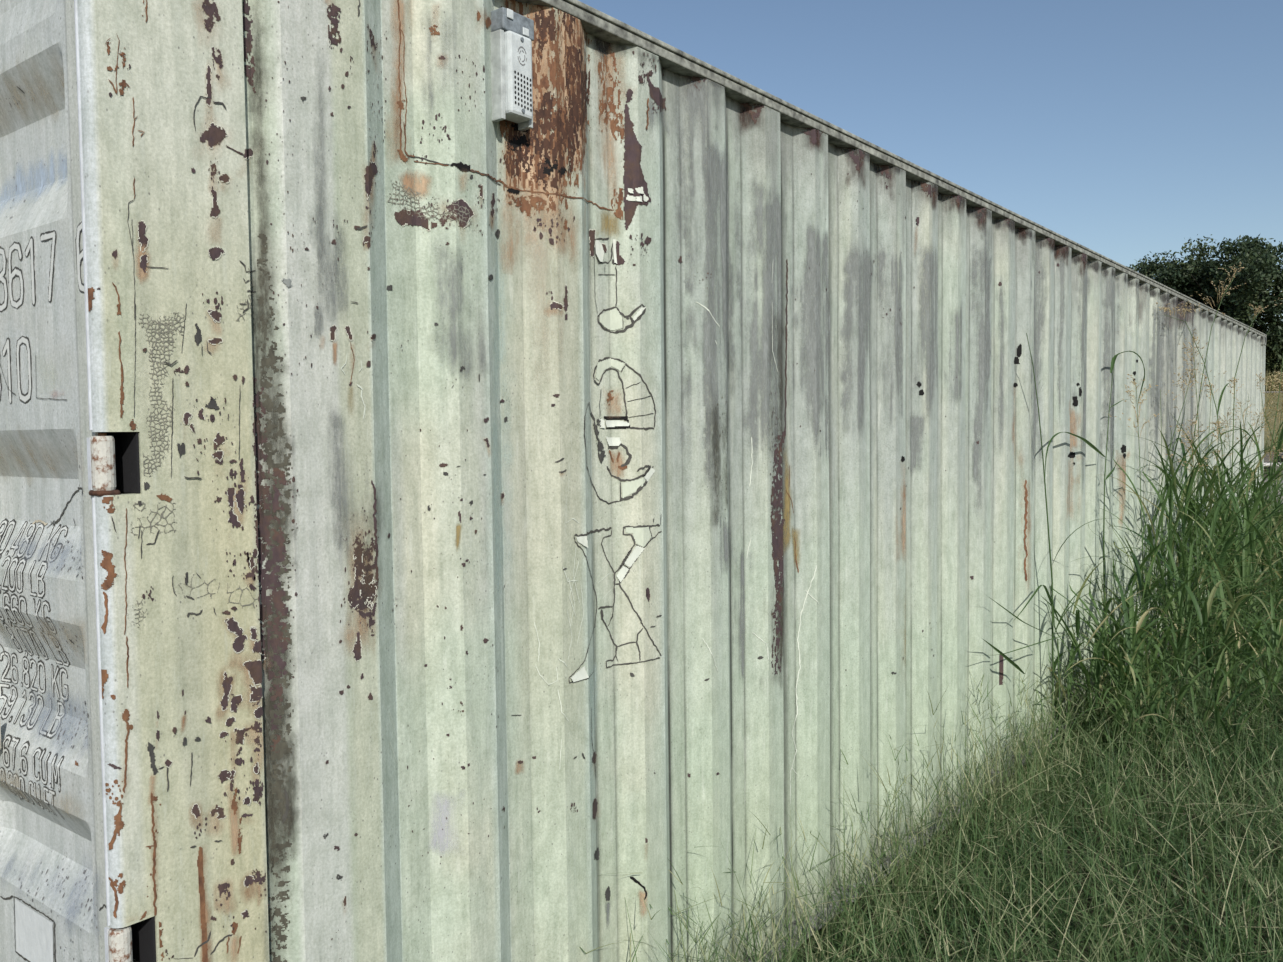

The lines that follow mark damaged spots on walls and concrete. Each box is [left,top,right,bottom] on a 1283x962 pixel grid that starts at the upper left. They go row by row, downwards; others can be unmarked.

corrosion [394,0,428,195]
corrosion [501,0,624,246]
peeling [600,307,646,330]
crack [127,177,257,628]
crack [406,154,662,684]
peeling [596,358,630,446]
peeling [618,466,655,498]
peeling [617,527,651,582]
corrosion [100,497,133,850]
peeling [571,666,589,682]
corrosion [108,873,126,918]
corrosion [197,847,210,962]